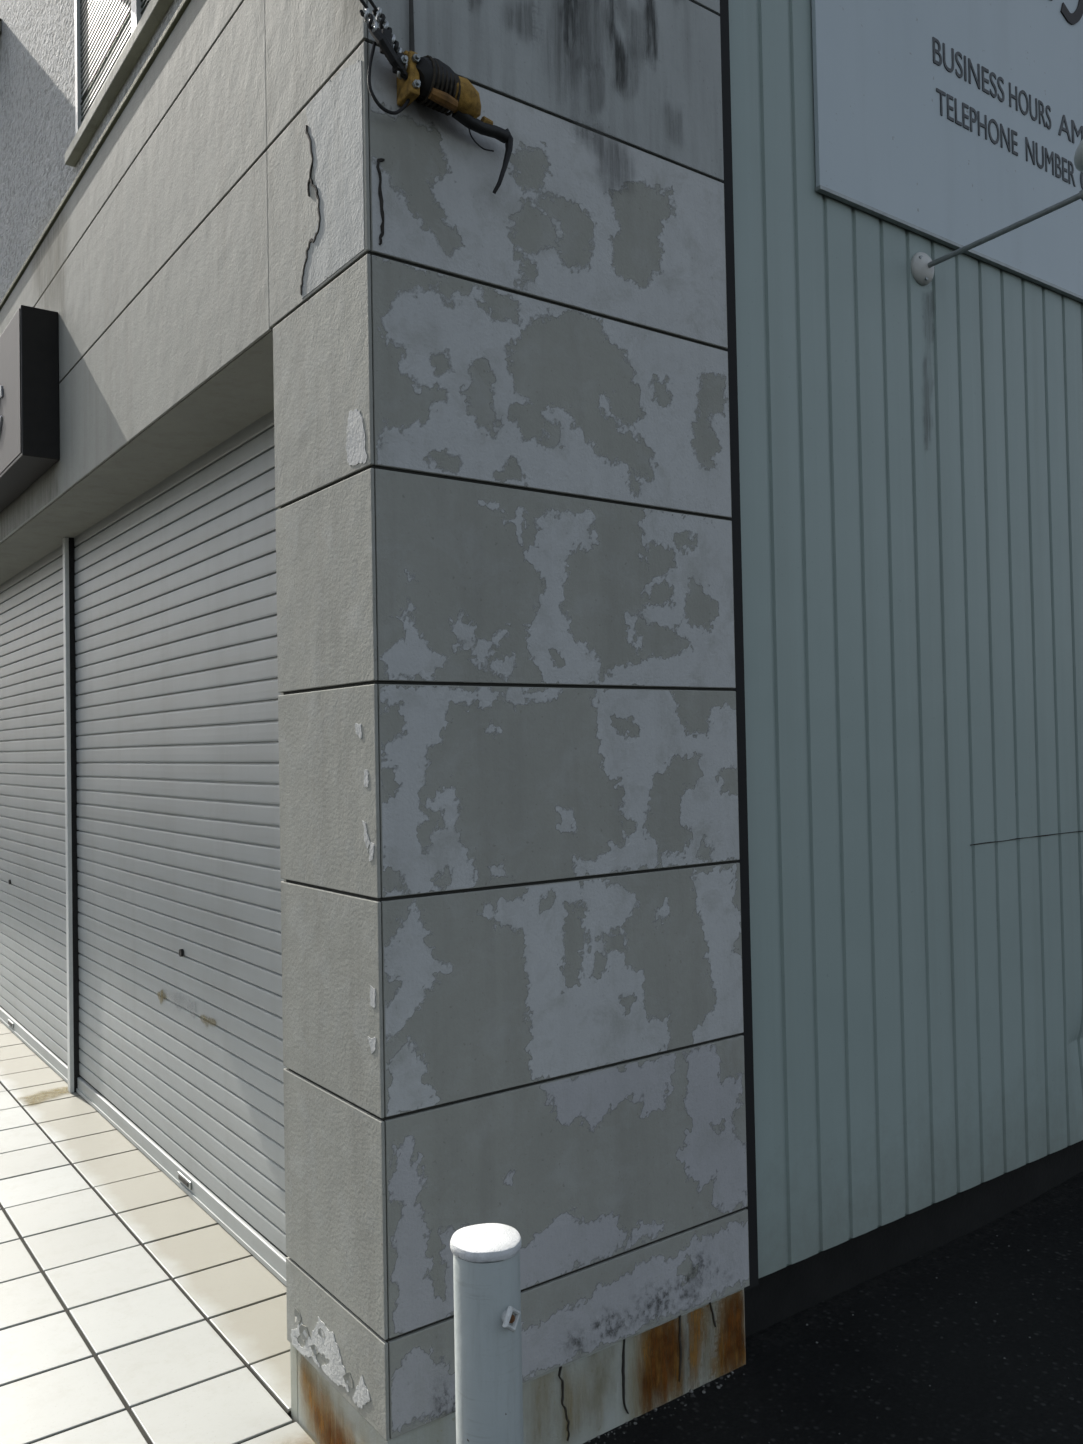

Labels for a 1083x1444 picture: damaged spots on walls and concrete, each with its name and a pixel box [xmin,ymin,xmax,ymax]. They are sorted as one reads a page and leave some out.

water stain [610,3,625,87]
water stain [647,0,657,58]
crack [300,125,321,295]
crack [376,158,385,245]
peeling [302,44,749,1382]
peeling [388,1135,466,1432]
rust [303,1373,345,1444]
spalling [290,1308,370,1409]
crack [558,1366,570,1441]
rust [638,1292,746,1414]